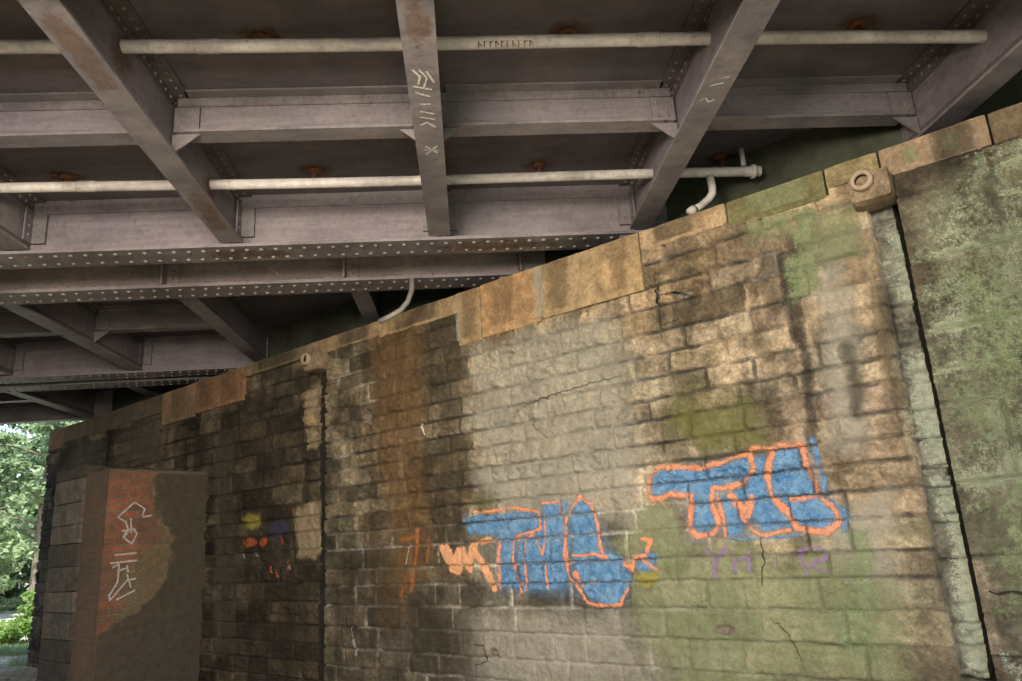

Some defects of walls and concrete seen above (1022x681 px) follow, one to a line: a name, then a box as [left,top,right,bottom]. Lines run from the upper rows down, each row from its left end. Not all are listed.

peeling [93,473,210,681]
crack [989,588,1022,596]